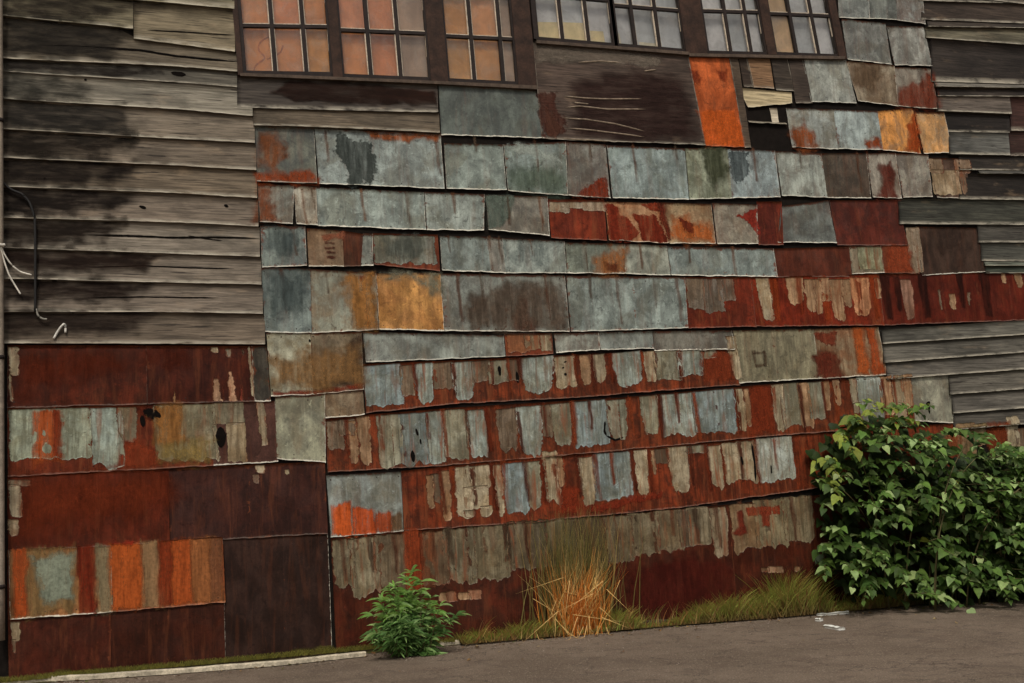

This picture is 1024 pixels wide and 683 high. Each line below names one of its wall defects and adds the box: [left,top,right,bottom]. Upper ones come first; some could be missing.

damp [328,130,377,190]
rust [703,111,742,146]
rust [791,124,818,160]
rust [572,177,712,297]
rust [737,209,761,235]
peeling [686,278,736,314]
peeling [755,278,775,321]
peeling [785,247,884,321]
peeling [938,289,971,310]
peeling [8,346,138,470]
peeling [326,334,914,602]
rust [9,535,224,620]